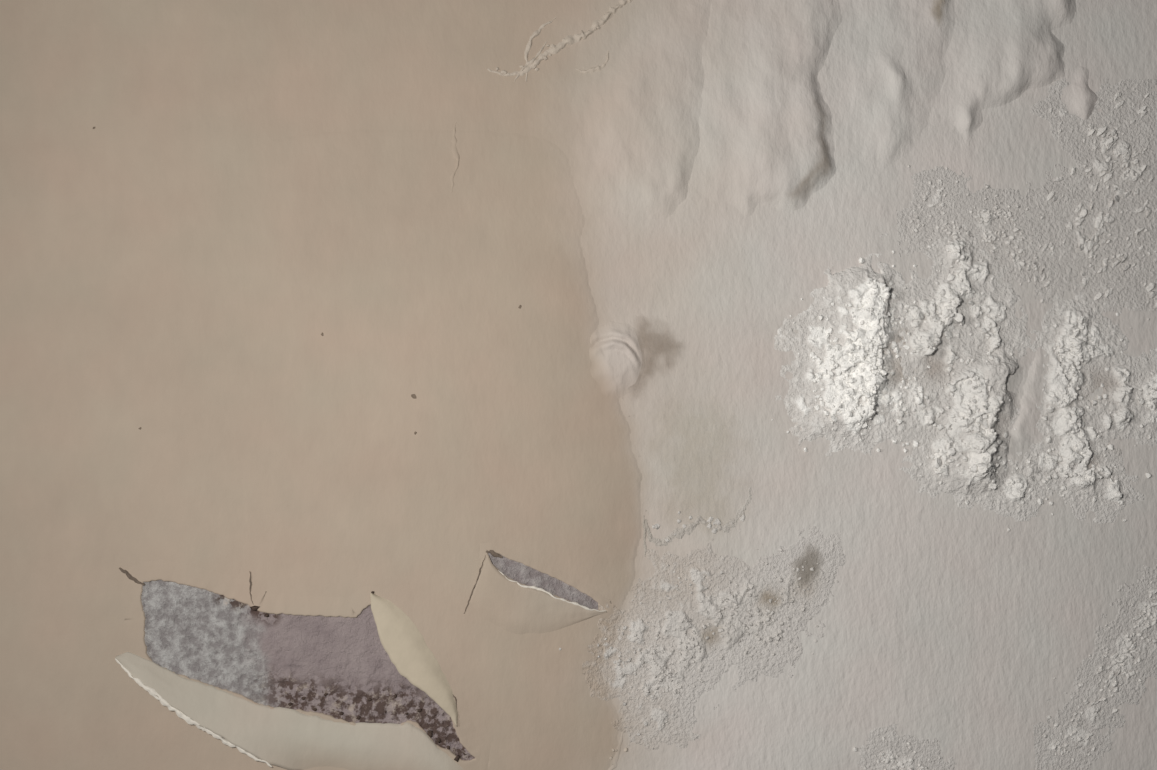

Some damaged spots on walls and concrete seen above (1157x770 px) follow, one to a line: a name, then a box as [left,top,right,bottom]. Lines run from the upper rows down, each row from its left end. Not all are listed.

crack [487,0,632,82]
peeling [115,560,491,770]
flaking render [464,516,846,750]